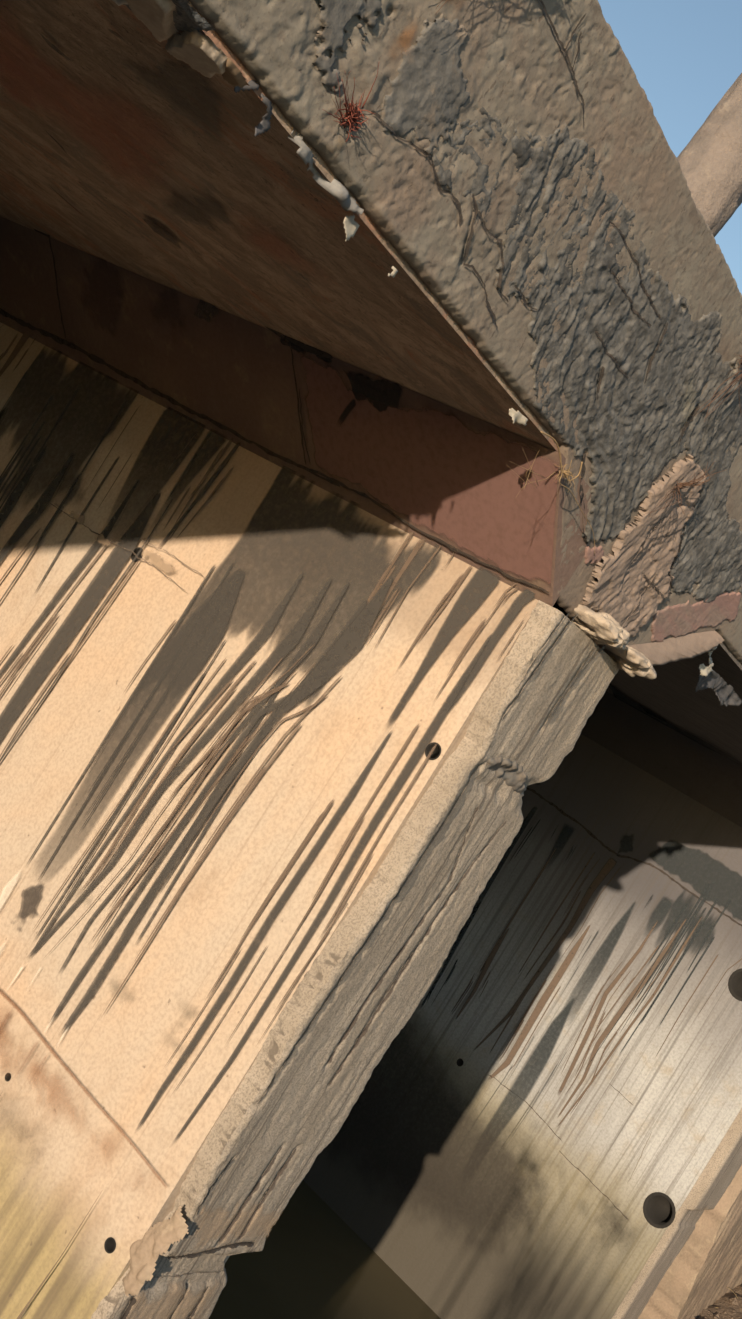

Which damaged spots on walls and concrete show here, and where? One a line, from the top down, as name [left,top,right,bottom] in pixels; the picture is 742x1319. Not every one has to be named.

damp [0,332,240,762]
peeling [112,0,250,88]
crack [0,229,578,719]
spalling [312,0,383,93]
damp [338,371,401,424]
crack [371,111,538,329]
spalling [381,13,742,603]
damp [0,466,455,1037]
damp [139,566,541,1140]
crack [259,765,506,1102]
damp [334,825,742,1230]
crack [158,1147,296,1319]